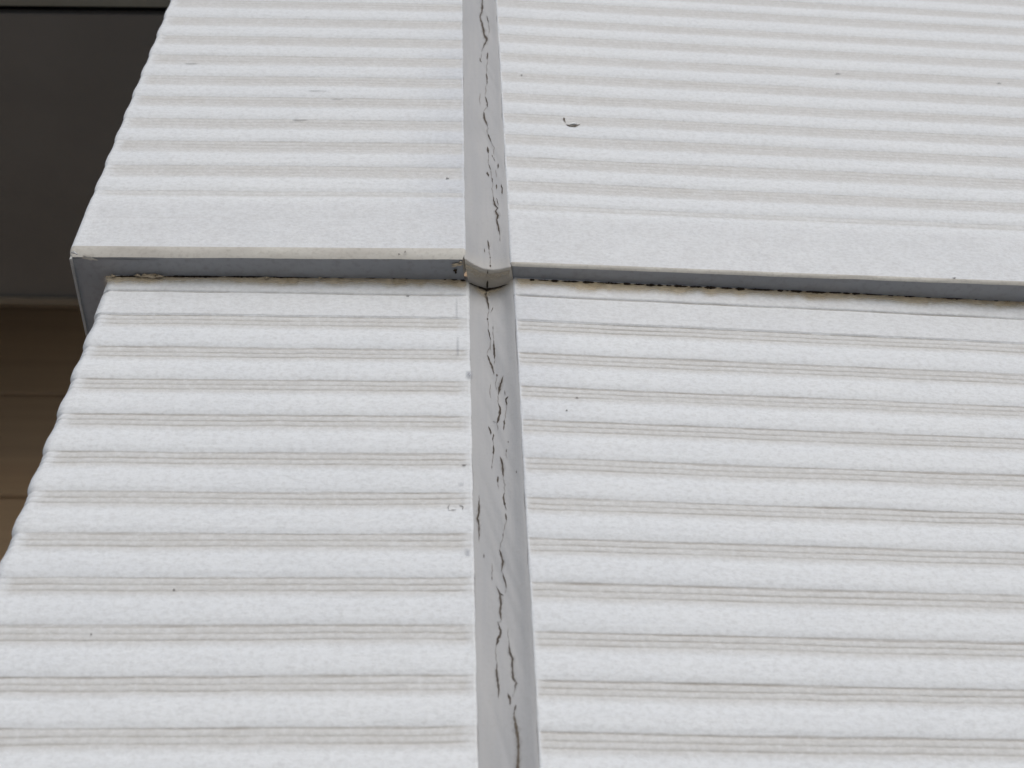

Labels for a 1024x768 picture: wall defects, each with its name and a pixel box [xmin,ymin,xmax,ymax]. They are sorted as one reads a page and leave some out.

crack [163,272,315,280]
crack [444,0,1010,768]